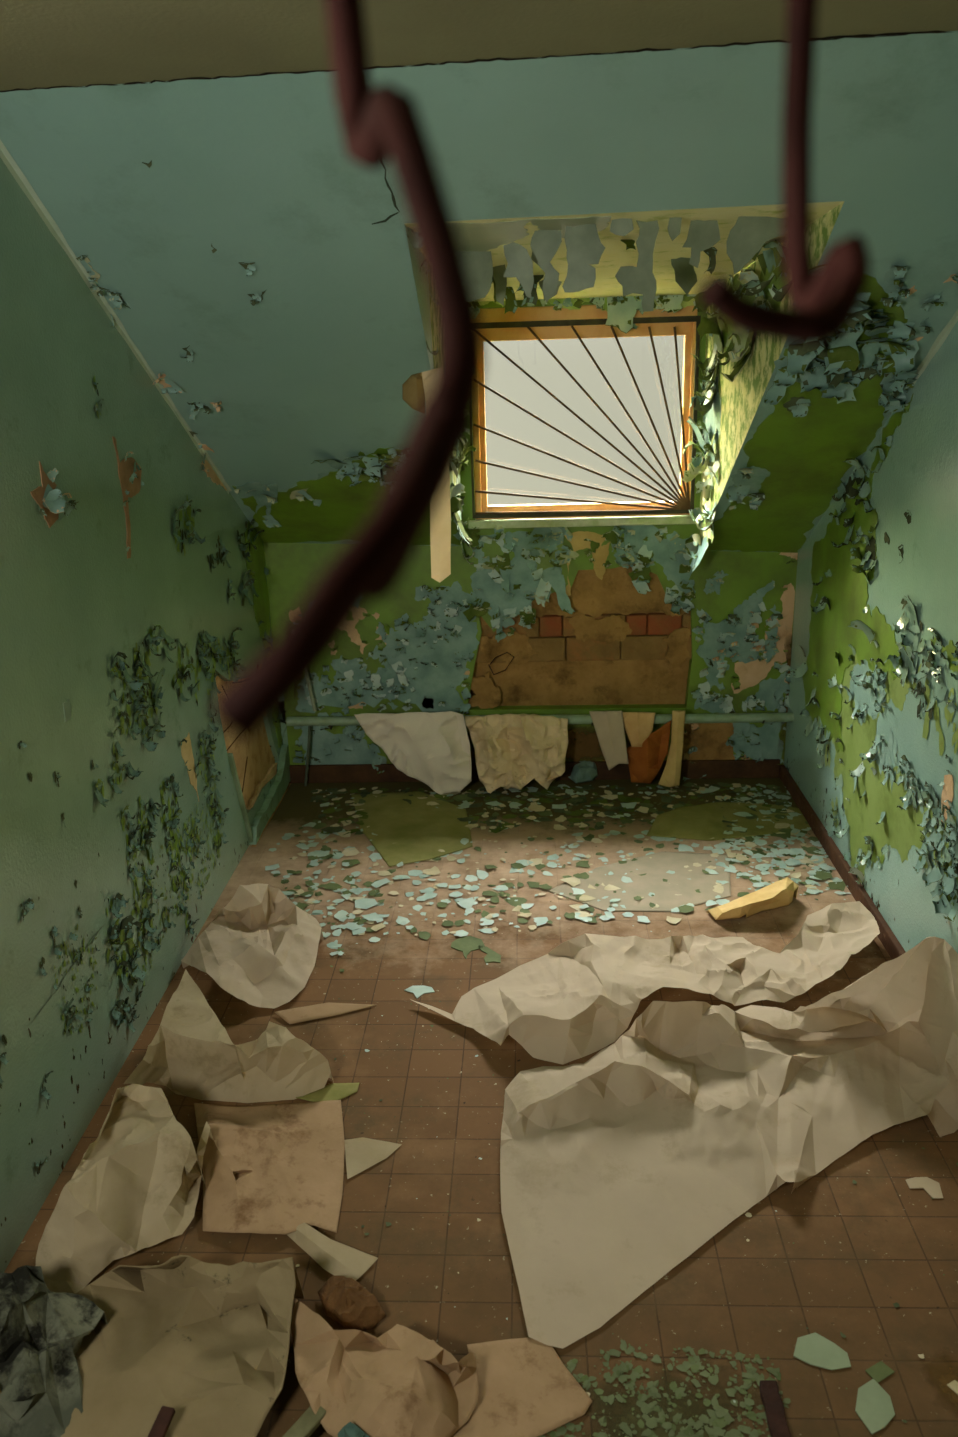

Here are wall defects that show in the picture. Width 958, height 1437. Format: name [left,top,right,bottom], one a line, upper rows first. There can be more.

crack [0,70,331,92]
crack [370,30,950,69]
crack [372,166,400,225]
peeling [30,461,79,528]
peeling [272,216,958,923]
peeling [39,372,414,1036]
peeling [423,828,591,959]
peeling [404,985,435,998]